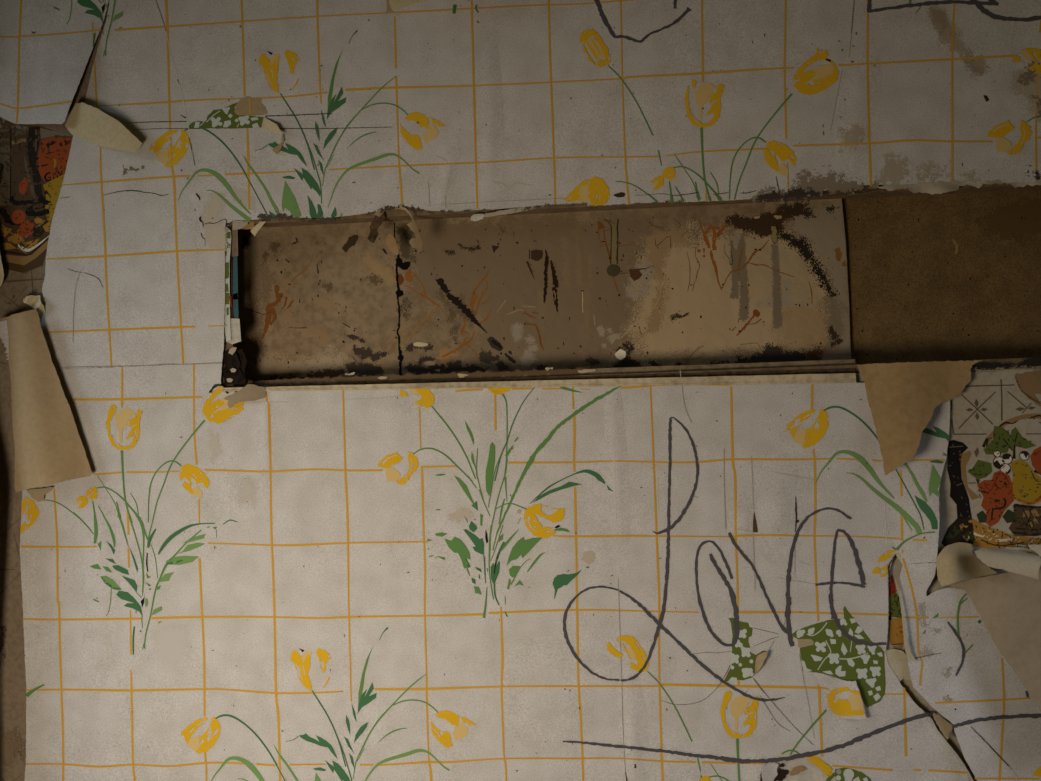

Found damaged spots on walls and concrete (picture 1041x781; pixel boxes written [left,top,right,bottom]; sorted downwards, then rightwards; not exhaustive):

spalling [342,235,358,253]
spalling [396,257,410,270]
spalling [526,250,558,312]
spalling [620,266,651,281]
spalling [436,278,503,351]
spalling [1015,370,1041,406]
peeling [760,752,871,781]